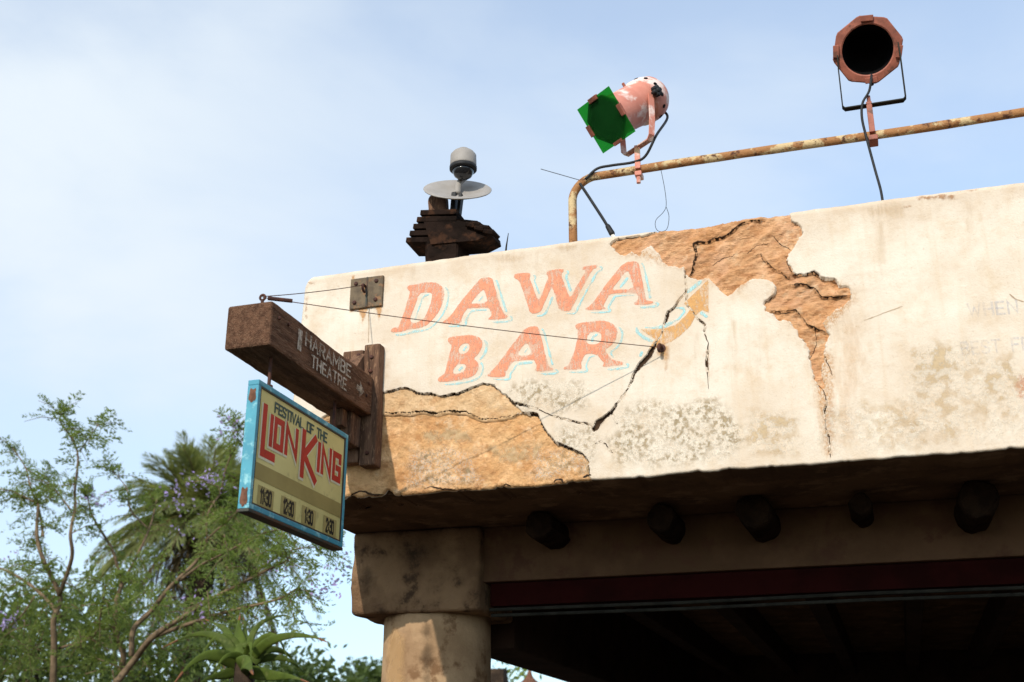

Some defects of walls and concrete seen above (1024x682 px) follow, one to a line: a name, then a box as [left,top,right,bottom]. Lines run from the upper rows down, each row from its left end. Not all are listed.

spalling [345,384,592,499]
crack [385,276,709,483]
spalling [611,215,852,391]
crack [819,357,832,457]